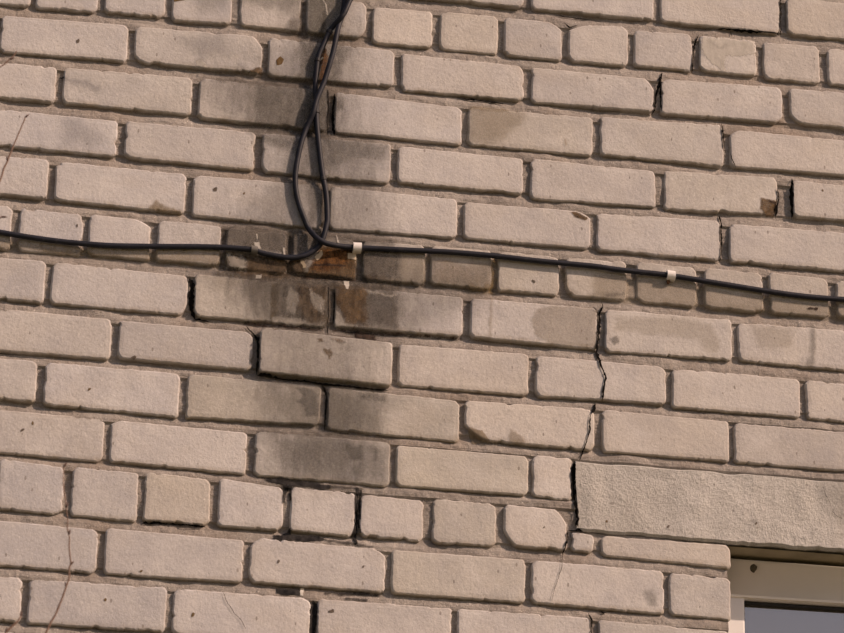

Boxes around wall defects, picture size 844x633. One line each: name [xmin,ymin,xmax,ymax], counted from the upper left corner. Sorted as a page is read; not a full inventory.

crack [692,0,782,71]
damp [313,91,328,137]
crack [651,73,662,115]
crack [775,180,794,220]
rust [301,246,357,282]
crack [188,277,209,322]
crack [327,286,335,335]
crack [246,326,389,430]
crack [552,304,607,599]